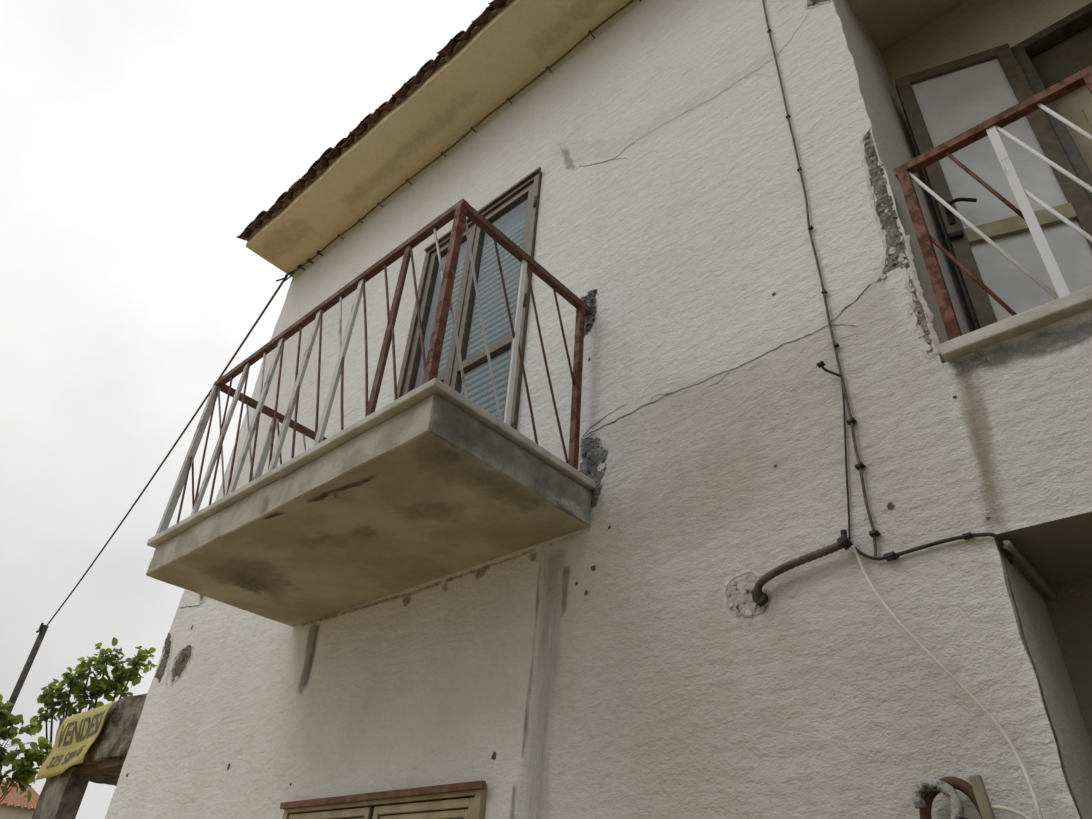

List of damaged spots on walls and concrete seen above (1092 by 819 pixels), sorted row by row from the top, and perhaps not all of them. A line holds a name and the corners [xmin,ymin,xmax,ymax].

flaking render [805,0,832,10]
crack [586,13,809,166]
flaking render [860,128,940,360]
crack [581,283,872,439]
leakage [953,320,1092,373]
flaking render [578,431,613,526]
spalling [722,568,776,627]
flaking render [155,633,194,686]